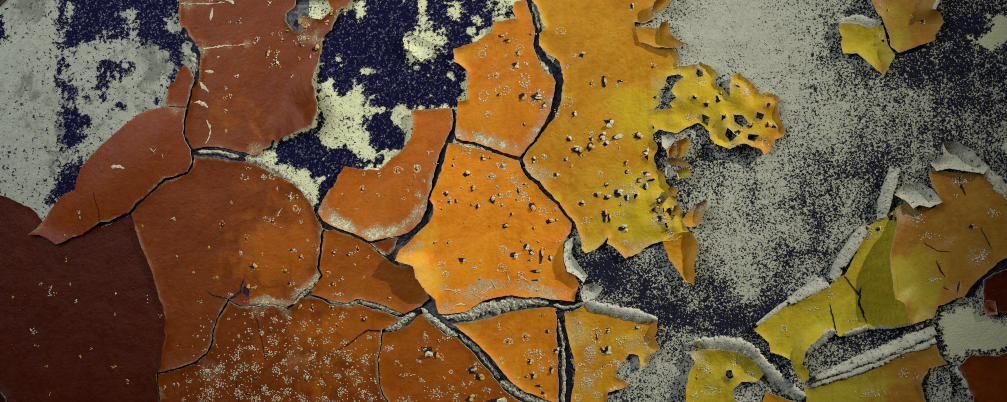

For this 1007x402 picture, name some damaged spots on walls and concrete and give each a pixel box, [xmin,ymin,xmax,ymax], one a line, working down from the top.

peeling [0,0,202,244]
crack [96,0,584,402]
peeling [255,0,556,234]
peeling [551,0,1007,402]